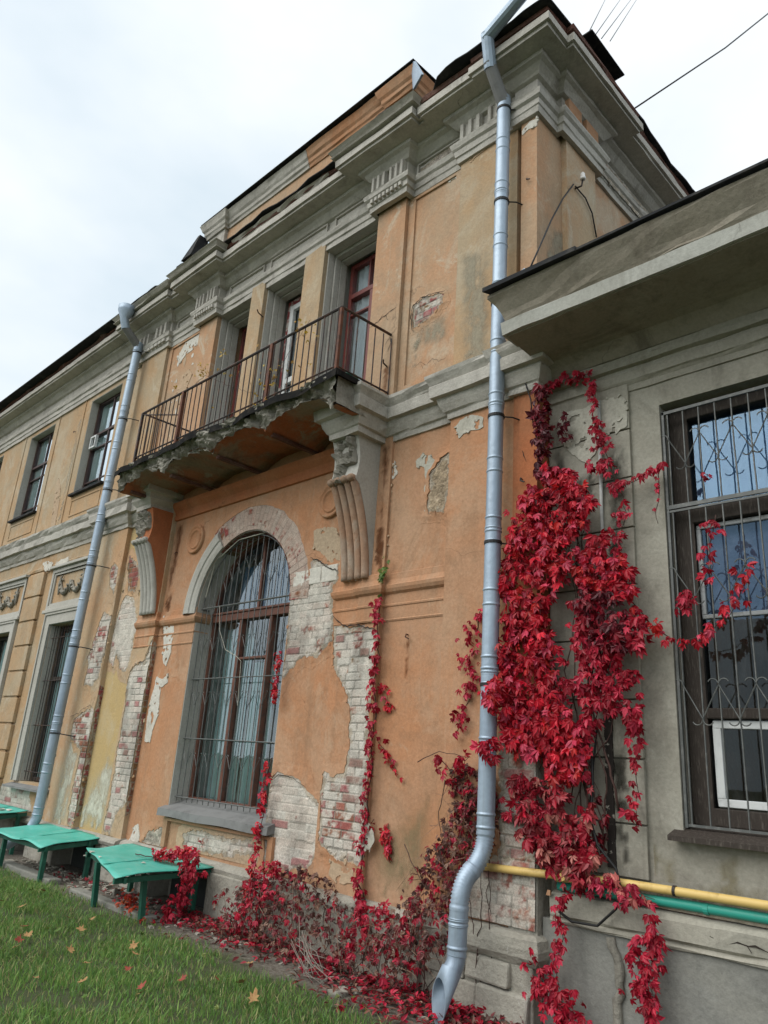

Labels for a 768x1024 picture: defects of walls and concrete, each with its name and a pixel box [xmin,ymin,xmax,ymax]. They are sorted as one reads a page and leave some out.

flaking render [409,286,451,336]
spalling [117,375,365,499]
flaking render [416,415,484,526]
flaking render [63,496,380,885]